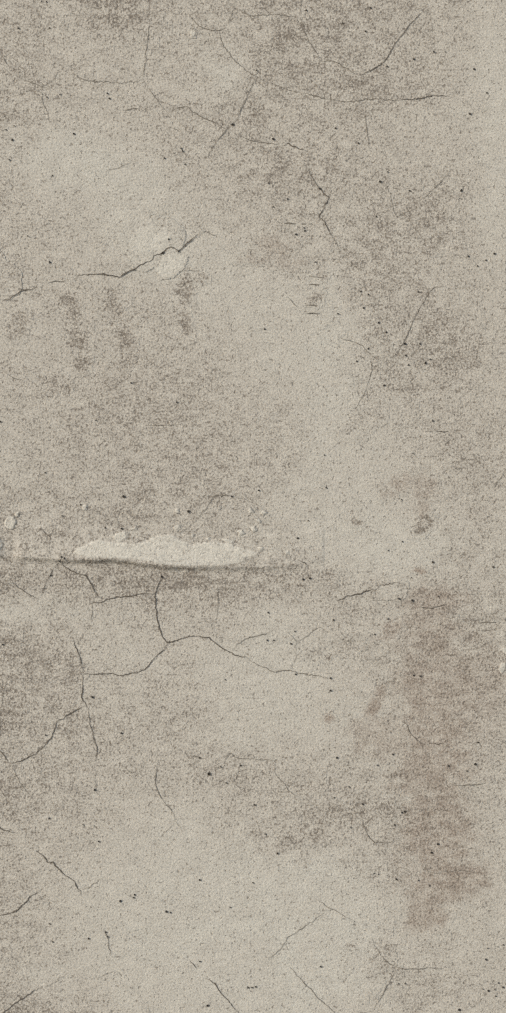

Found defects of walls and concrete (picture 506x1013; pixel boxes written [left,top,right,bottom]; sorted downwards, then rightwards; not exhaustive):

crack [1,0,444,252]
crack [5,231,215,300]
peeling [71,507,267,568]
crack [0,531,324,799]
crack [37,851,96,896]